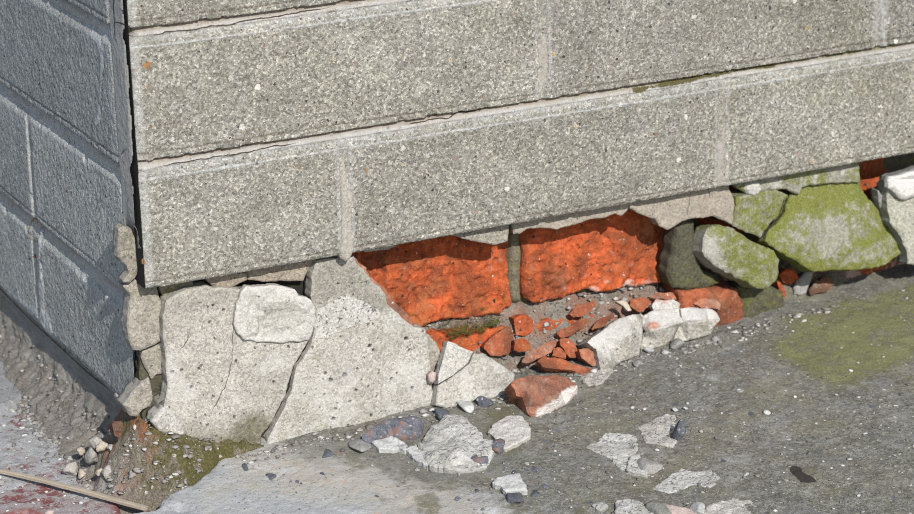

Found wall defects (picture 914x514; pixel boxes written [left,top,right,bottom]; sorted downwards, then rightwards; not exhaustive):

crack [113,0,329,290]
flaking render [870,165,914,265]
spalling [771,257,847,301]
crack [212,327,234,410]
crack [261,340,309,436]
flaking render [146,256,665,444]
peeling [487,415,531,452]